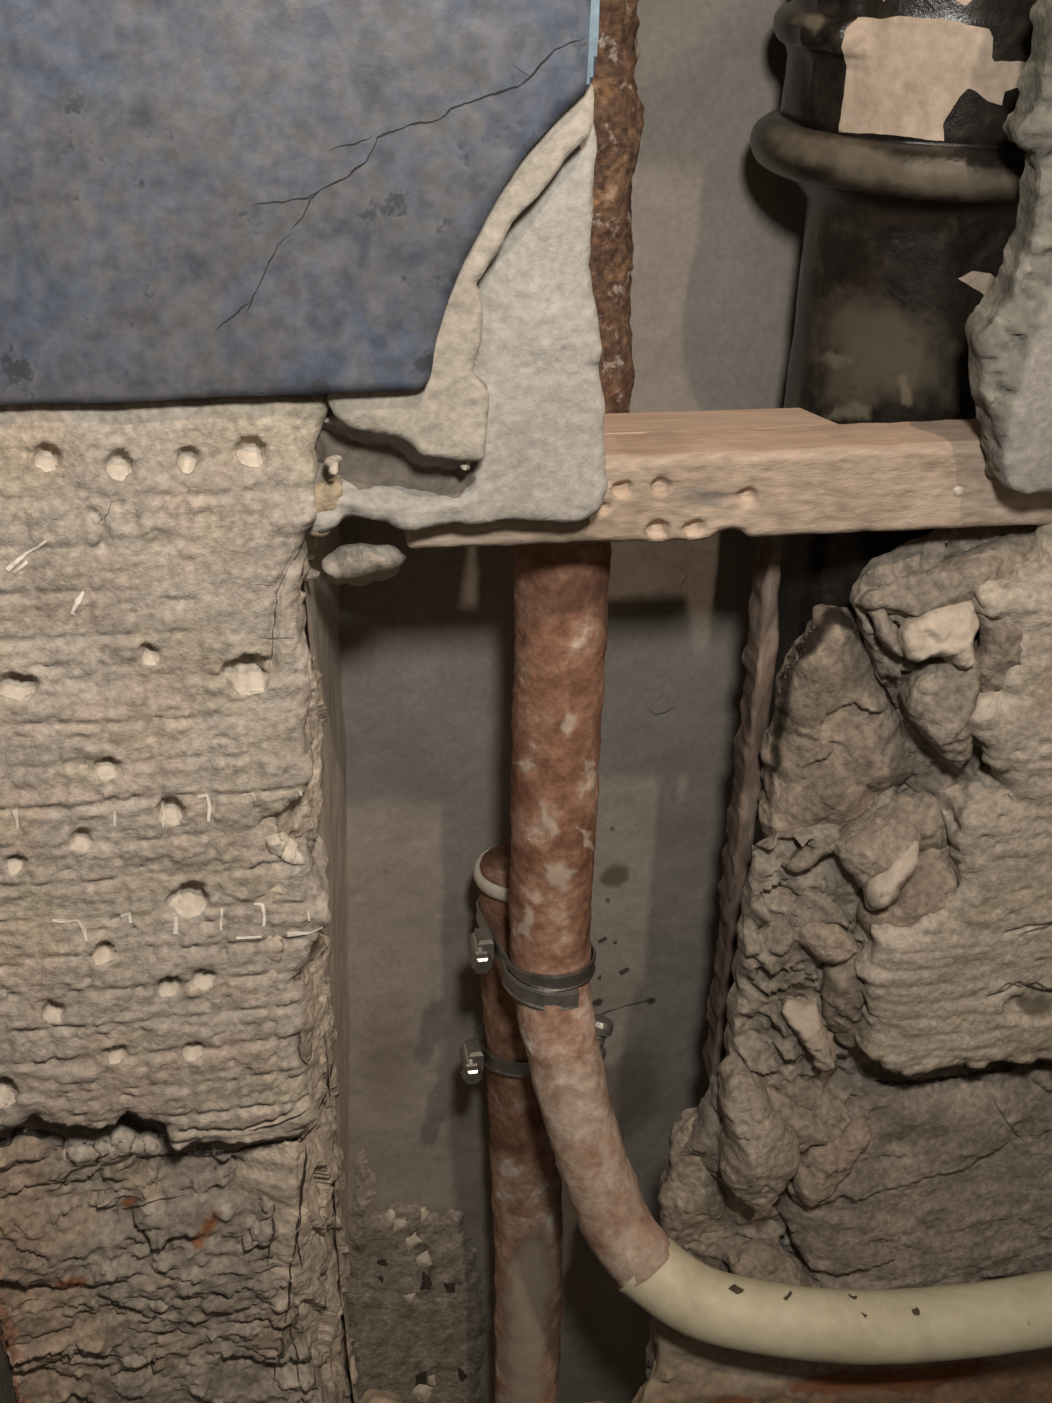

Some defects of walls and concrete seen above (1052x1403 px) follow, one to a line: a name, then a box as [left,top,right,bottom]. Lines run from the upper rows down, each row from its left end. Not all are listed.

crack [214,38,584,332]
peeling [958,271,996,295]
spalling [1019,993,1051,1016]
crack [0,1036,339,1385]
spalling [346,1149,489,1403]